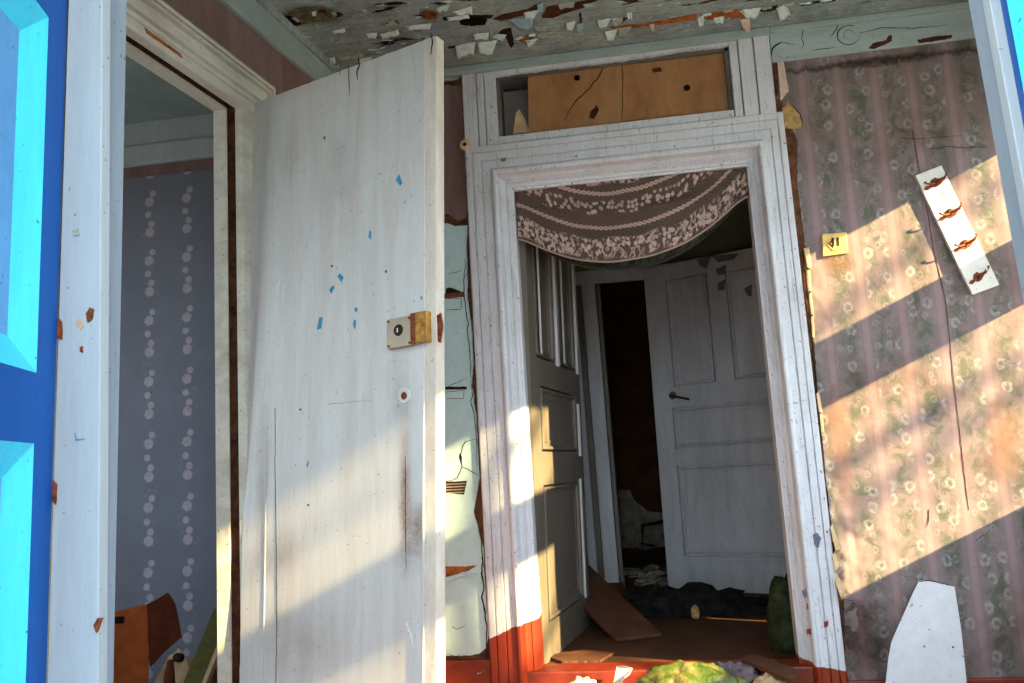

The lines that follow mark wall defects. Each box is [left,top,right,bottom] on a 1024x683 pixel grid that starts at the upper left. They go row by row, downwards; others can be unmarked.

peeling [312,10,346,43]
peeling [329,0,598,68]
peeling [597,0,791,41]
peeling [869,35,892,49]
peeling [918,35,952,43]
crack [565,67,623,120]
crack [904,129,989,171]
spalling [437,288,464,343]
crack [925,189,969,510]
spalling [445,378,467,399]
crack [445,262,477,482]
spalling [445,565,478,582]